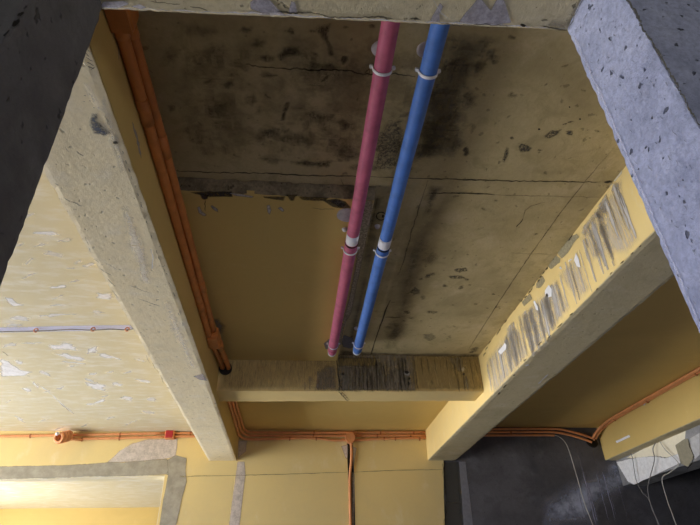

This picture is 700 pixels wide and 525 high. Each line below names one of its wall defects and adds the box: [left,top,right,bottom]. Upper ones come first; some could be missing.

crack [251,65,373,75]
spalling [191,191,232,207]
crack [182,171,356,184]
spalling [264,195,350,209]
damp [229,183,636,390]
crack [384,170,611,339]
peeling [520,234,580,310]
spalling [617,431,700,485]